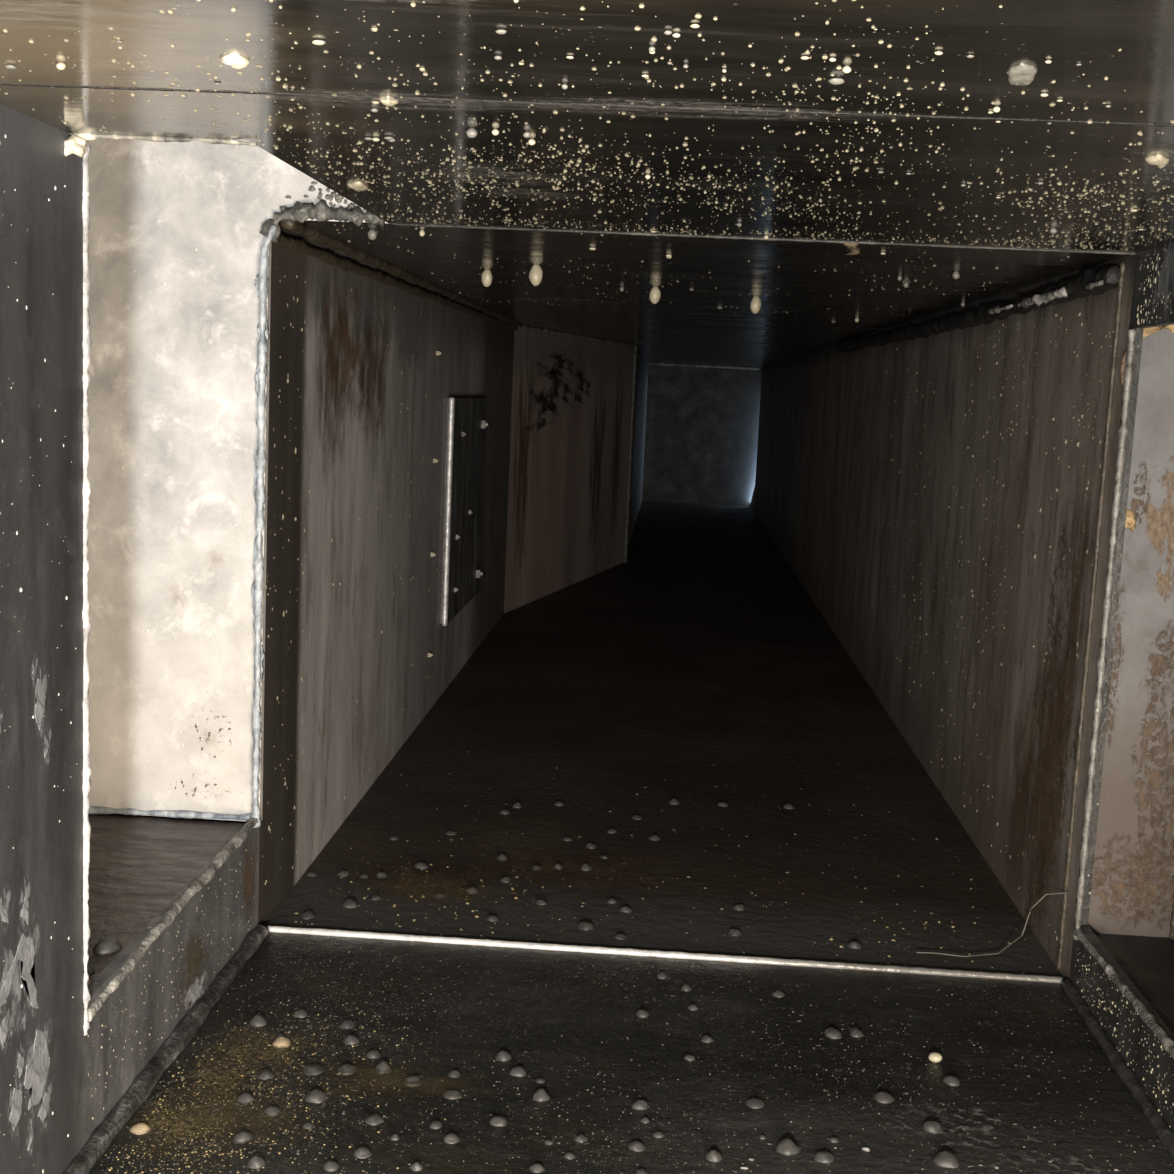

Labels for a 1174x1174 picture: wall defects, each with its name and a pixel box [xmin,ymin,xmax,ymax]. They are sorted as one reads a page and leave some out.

corrosion [1131,457,1174,602]
corrosion [1091,611,1174,928]
peeling [0,875,52,1160]